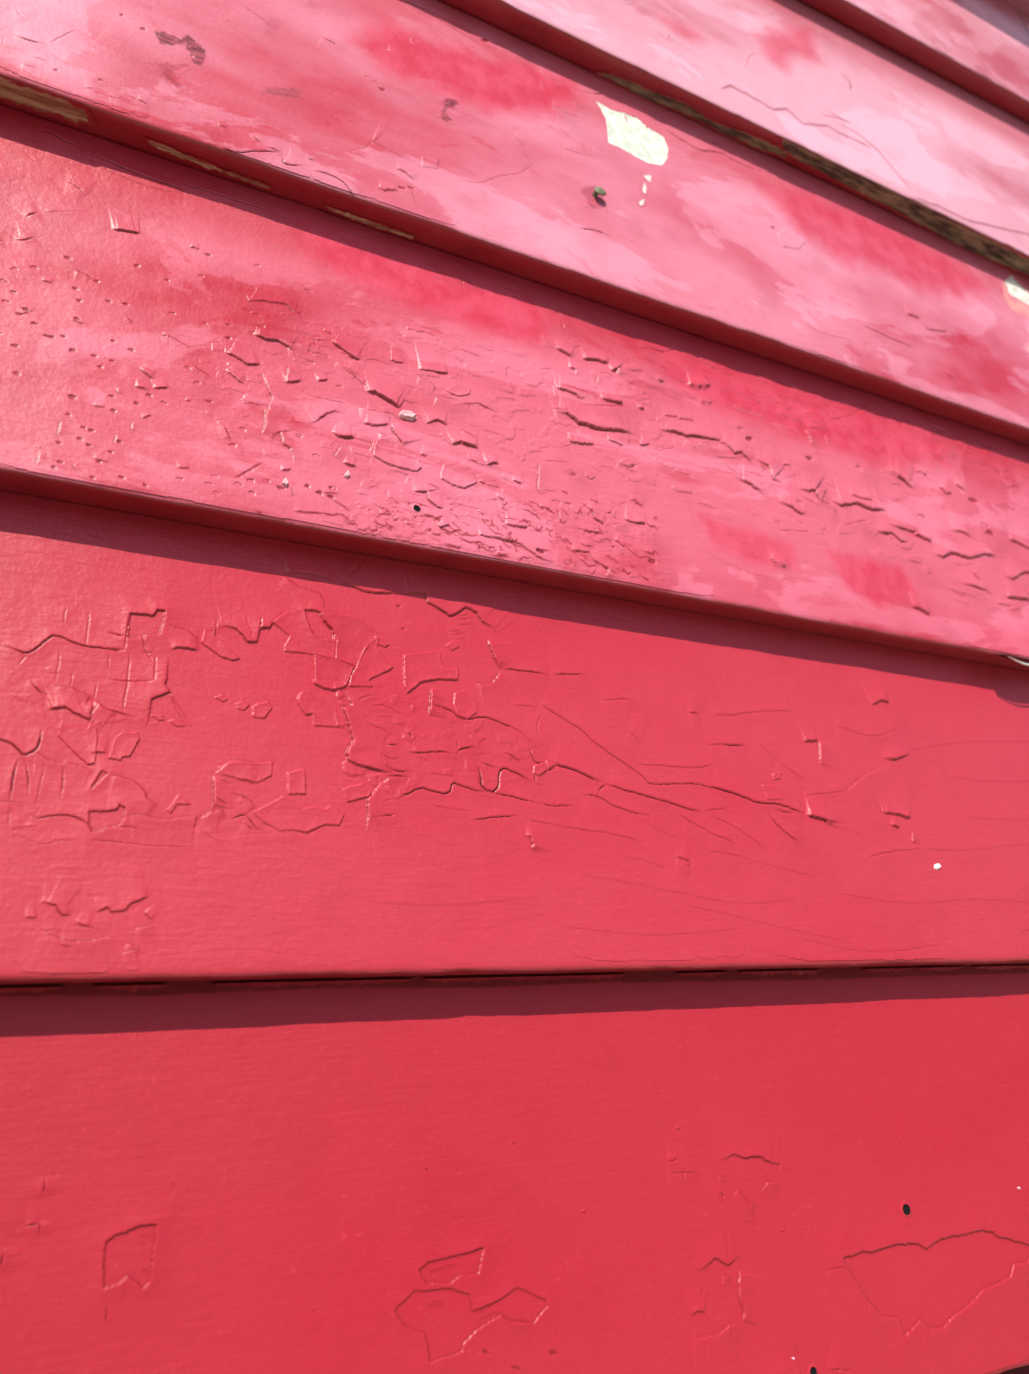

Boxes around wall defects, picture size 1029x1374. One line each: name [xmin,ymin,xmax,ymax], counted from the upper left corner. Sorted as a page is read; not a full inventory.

peeling [593,78,670,207]
peeling [0,201,1029,617]
crack [800,371,935,446]
crack [942,314,958,400]
peeling [0,539,591,973]
crack [377,659,1029,961]
peeling [793,710,854,777]
peeling [878,776,924,845]